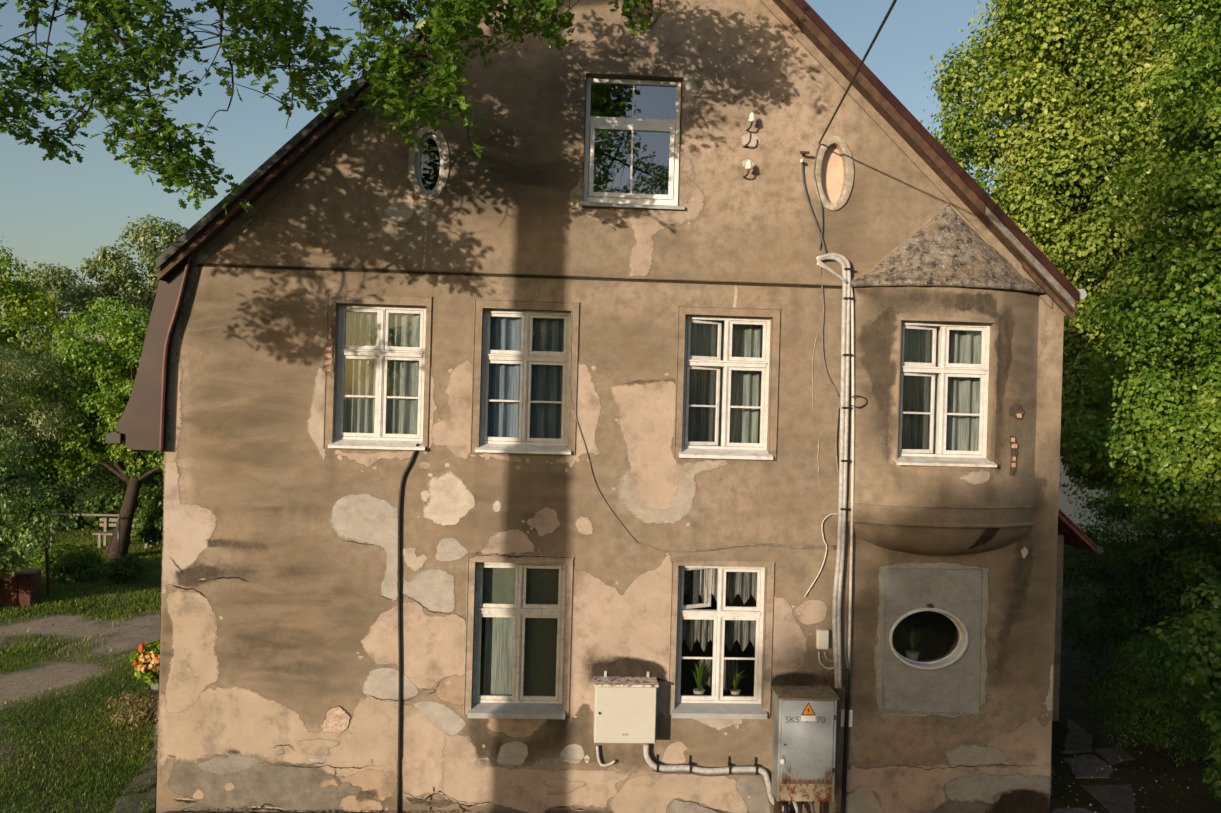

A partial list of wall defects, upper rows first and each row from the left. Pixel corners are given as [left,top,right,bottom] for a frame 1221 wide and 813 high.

peeling [569,155,705,277]
peeling [335,359,530,477]
peeling [546,355,697,527]
peeling [156,591,751,813]
peeling [839,664,1054,813]
water stain [985,789,1050,813]